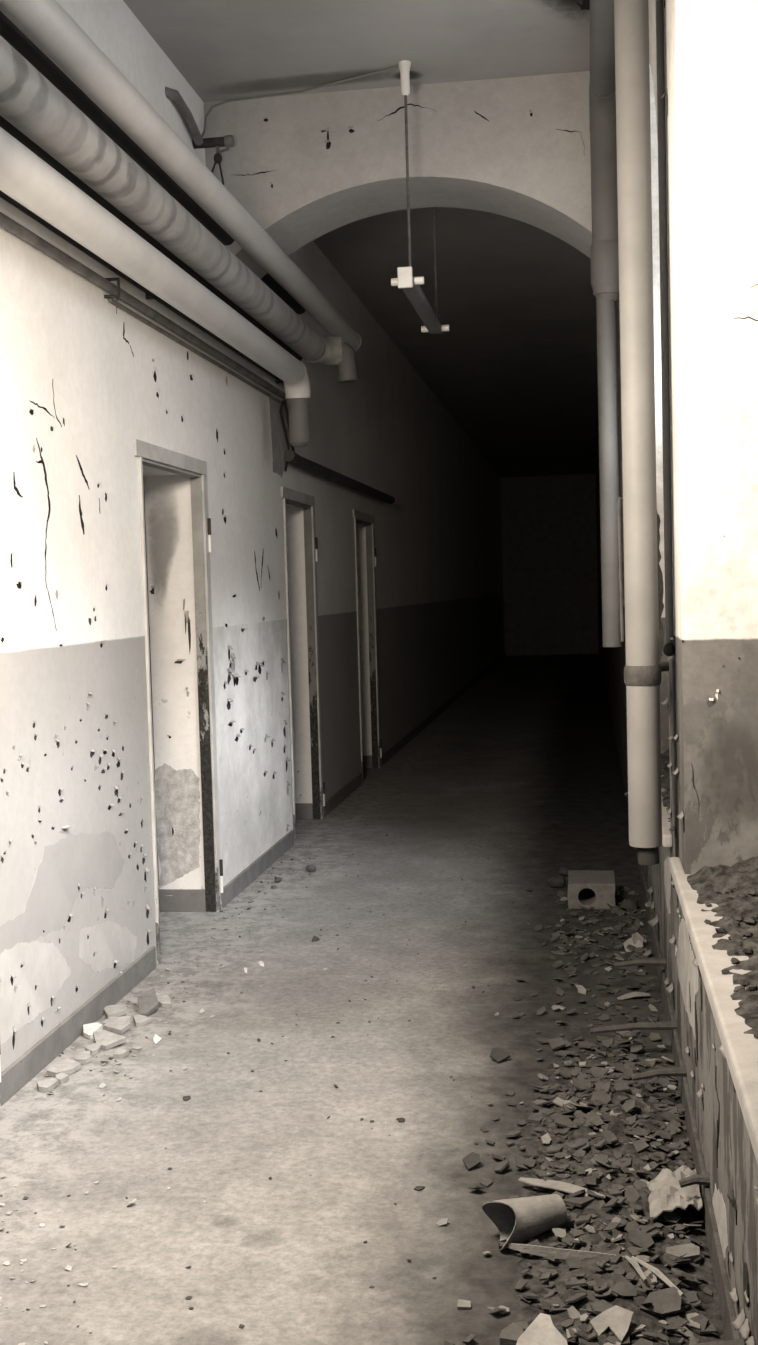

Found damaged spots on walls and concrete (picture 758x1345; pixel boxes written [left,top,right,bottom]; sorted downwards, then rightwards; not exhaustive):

crack [13,380,100,631]
peeling [175,599,191,664]
flaking render [666,1243,700,1265]
flaking render [712,1183,755,1345]
flaking render [640,1287,681,1316]